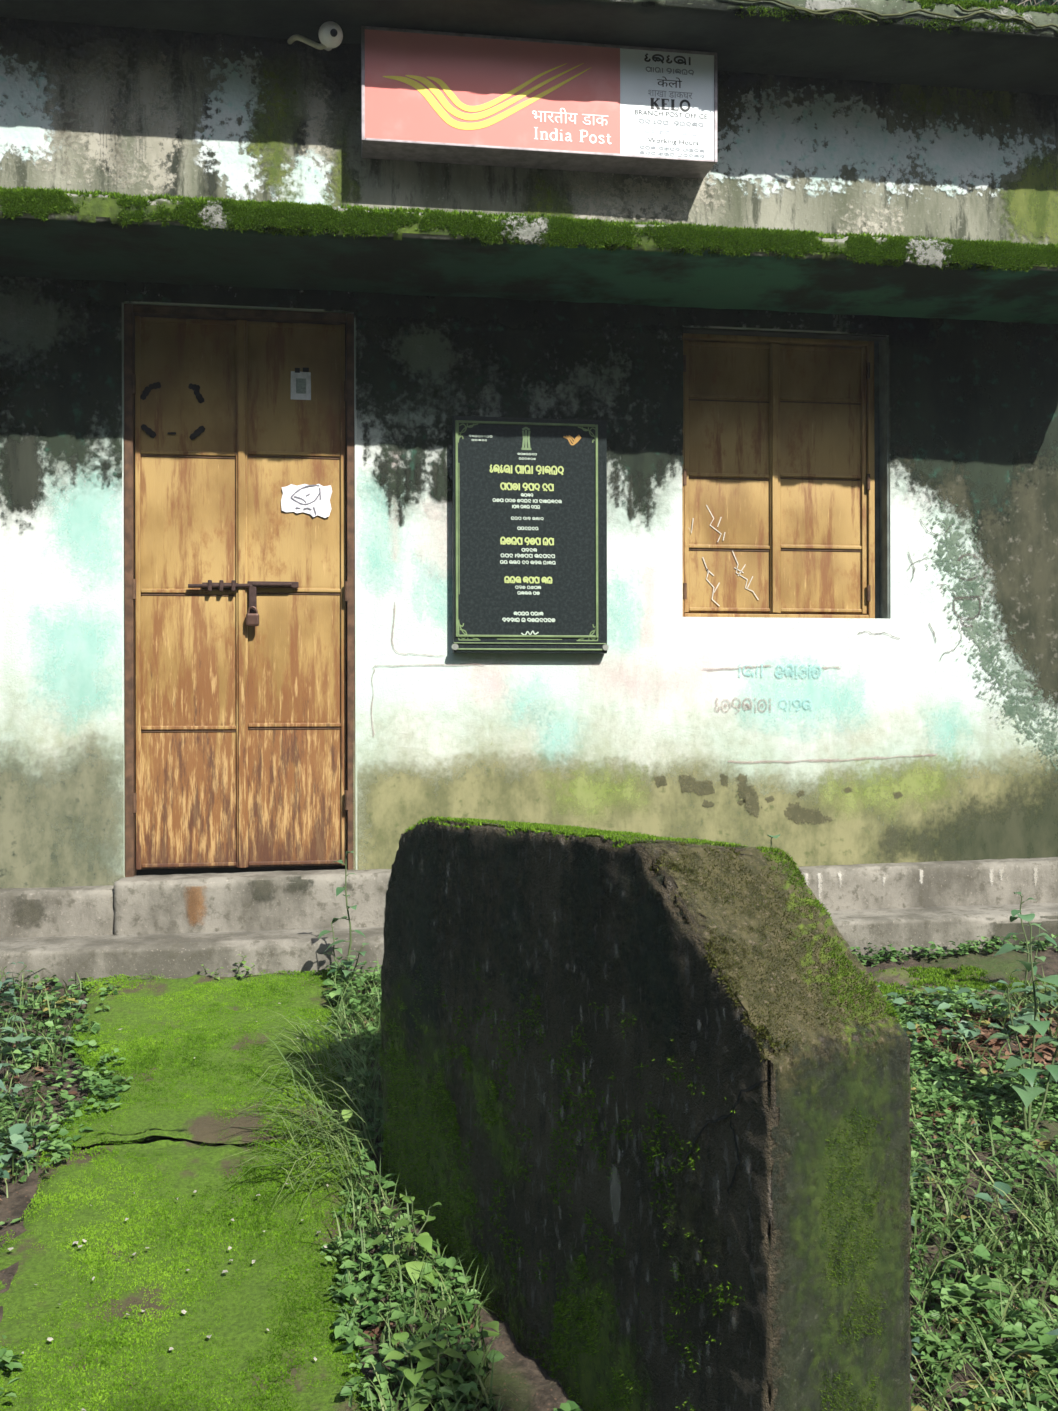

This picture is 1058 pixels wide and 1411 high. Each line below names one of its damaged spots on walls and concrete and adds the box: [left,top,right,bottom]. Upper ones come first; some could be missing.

water stain [158,122,182,197]
water stain [203,97,218,198]
water stain [292,116,309,162]
water stain [0,276,1058,708]
water stain [0,736,124,926]
water stain [253,876,313,901]
water stain [344,742,1058,1062]